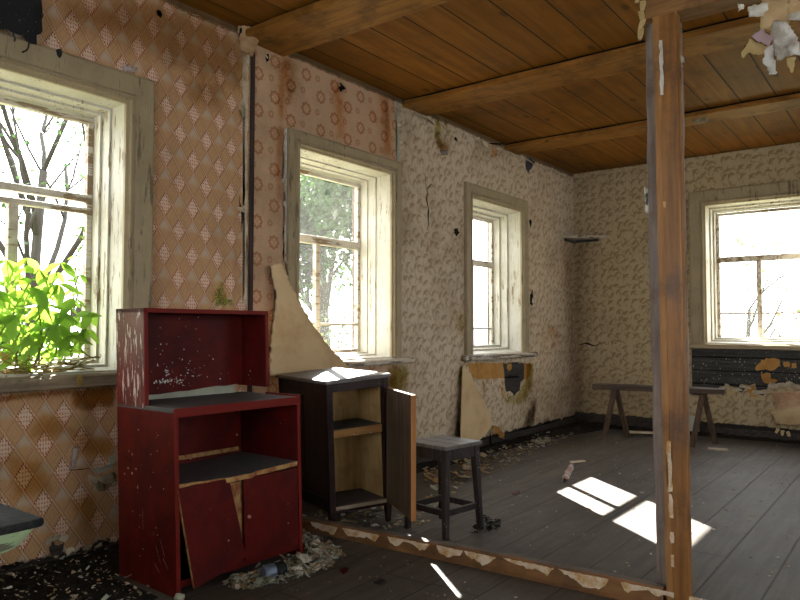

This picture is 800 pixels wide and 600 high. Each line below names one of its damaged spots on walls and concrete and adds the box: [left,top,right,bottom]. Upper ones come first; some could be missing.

spalling [467,362,531,400]
peeling [703,381,800,434]